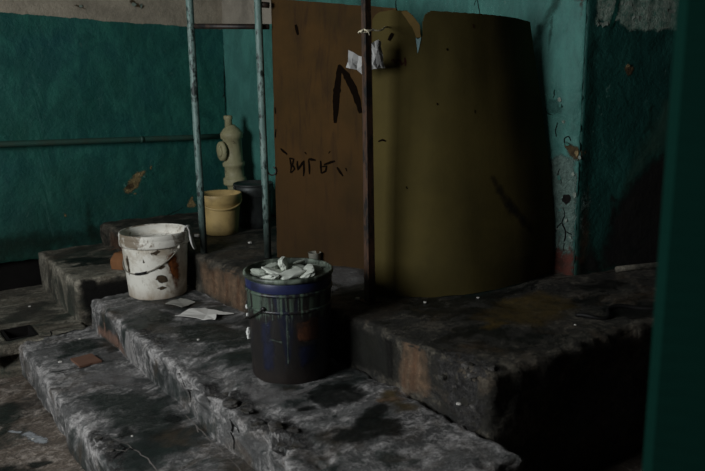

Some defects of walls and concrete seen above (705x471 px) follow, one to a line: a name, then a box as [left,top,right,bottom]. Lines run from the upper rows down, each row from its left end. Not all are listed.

peeling [596,0,677,32]
peeling [123,166,152,194]
spalling [549,136,588,254]